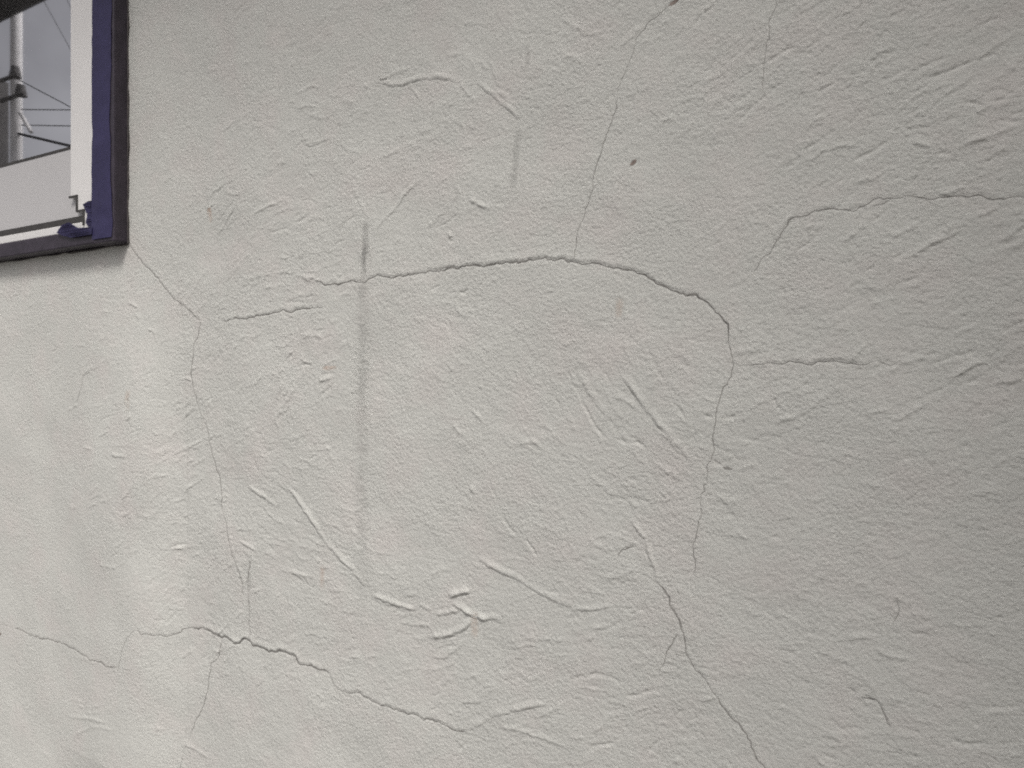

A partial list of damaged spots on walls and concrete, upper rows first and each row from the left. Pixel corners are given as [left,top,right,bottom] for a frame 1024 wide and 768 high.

crack [227,0,902,572]
crack [755,194,1023,270]
crack [4,245,466,766]
crack [659,584,766,768]
crack [849,685,891,726]